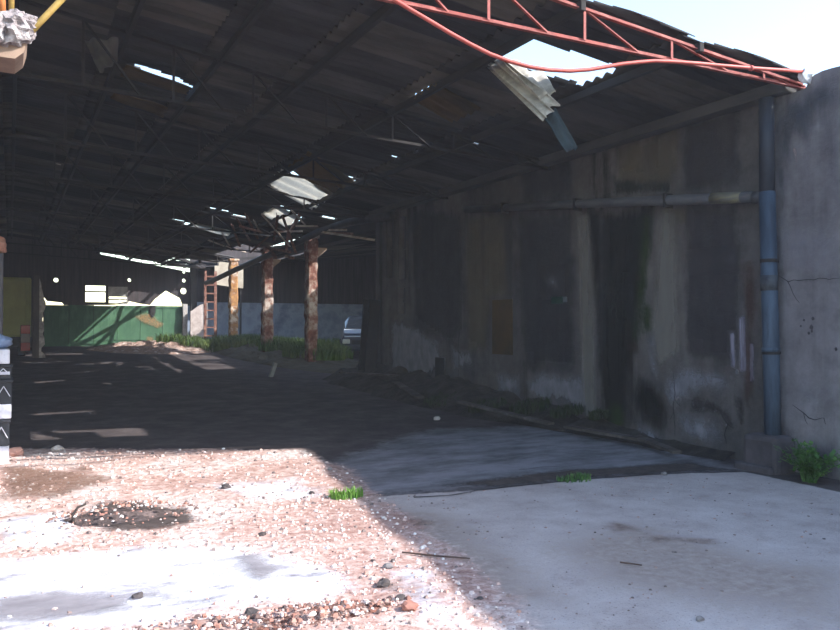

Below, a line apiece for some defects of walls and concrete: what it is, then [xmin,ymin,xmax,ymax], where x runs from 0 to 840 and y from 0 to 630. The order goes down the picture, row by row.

damp [578,206,677,427]